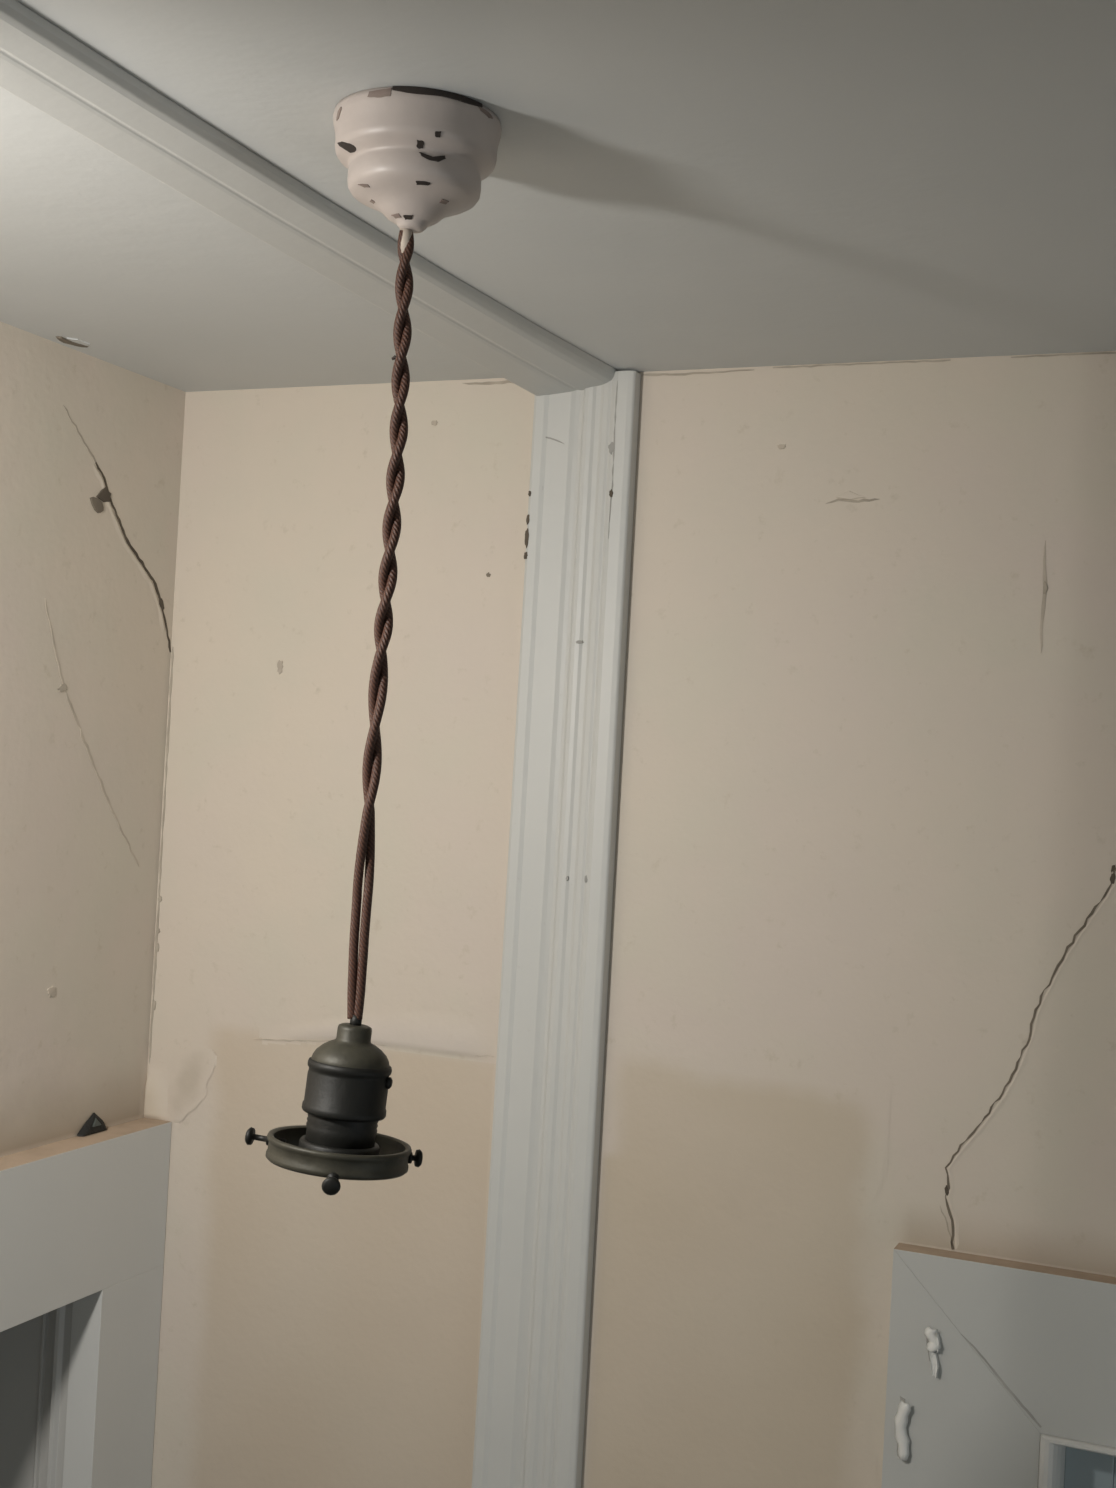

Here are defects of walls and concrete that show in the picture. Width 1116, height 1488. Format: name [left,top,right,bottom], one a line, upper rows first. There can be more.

crack [45,405,174,1063]
crack [940,865,1116,1250]